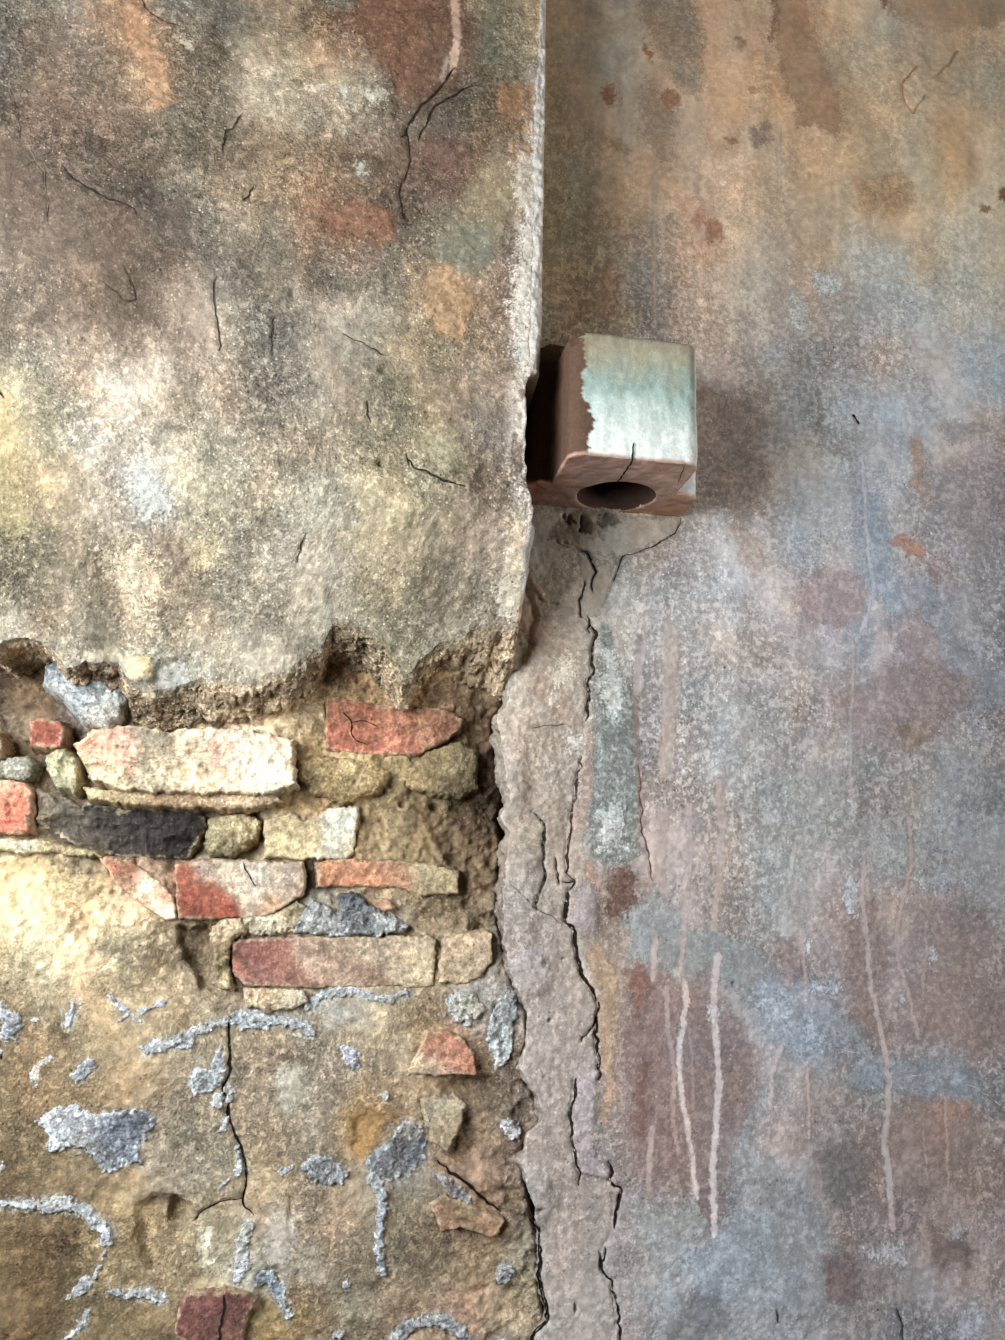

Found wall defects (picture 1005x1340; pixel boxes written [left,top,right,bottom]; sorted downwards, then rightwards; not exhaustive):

leakage [882,0,1005,32]
crack [399,67,470,221]
leakage [640,0,930,335]
leakage [909,437,932,508]
leakage [941,315,1005,444]
crack [534,521,681,728]
crack [638,768,652,879]
spalling [0,509,679,1340]
crack [192,1024,254,1221]
crack [511,756,623,1340]
leakage [622,779,1005,1340]